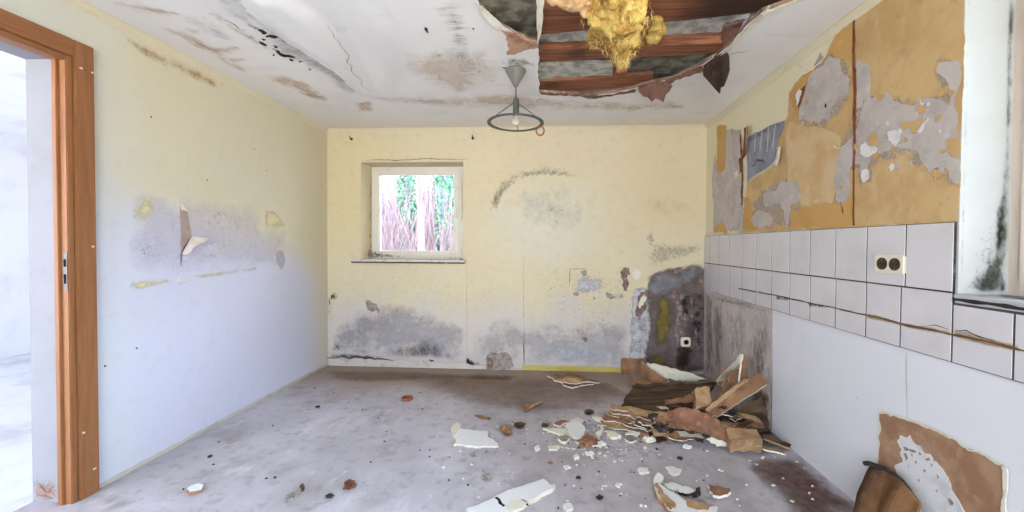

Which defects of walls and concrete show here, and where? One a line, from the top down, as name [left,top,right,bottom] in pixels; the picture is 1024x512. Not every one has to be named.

spalling [475,1,539,55]
spalling [540,0,803,102]
peeling [711,0,966,234]
damp [978,196,1024,299]
damp [327,310,454,361]
spalling [569,267,650,359]
damp [644,236,847,512]
crack [952,298,1024,311]